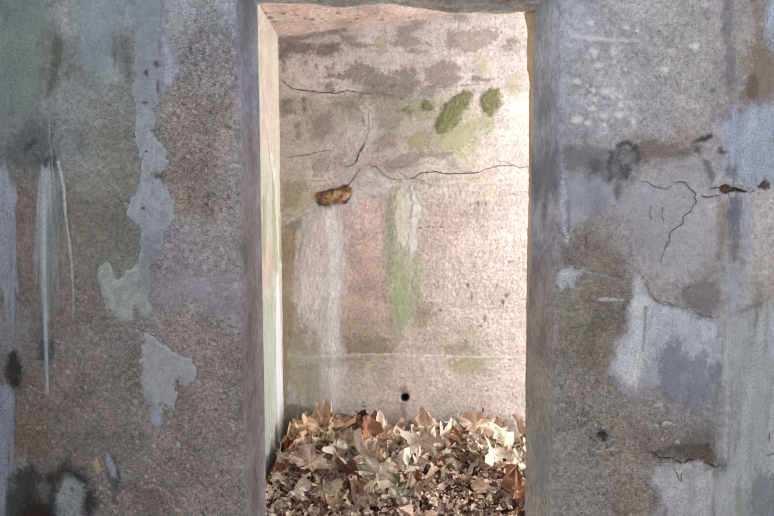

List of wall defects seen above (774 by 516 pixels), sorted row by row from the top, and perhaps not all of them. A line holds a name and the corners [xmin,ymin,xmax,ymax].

crack [282,80,387,95]
peeling [96,0,176,322]
crack [315,113,529,185]
water stain [719,105,774,184]
water stain [0,128,72,373]
water stain [263,136,524,446]
water stain [533,141,774,516]
crack [644,181,758,262]
peeling [139,333,197,426]